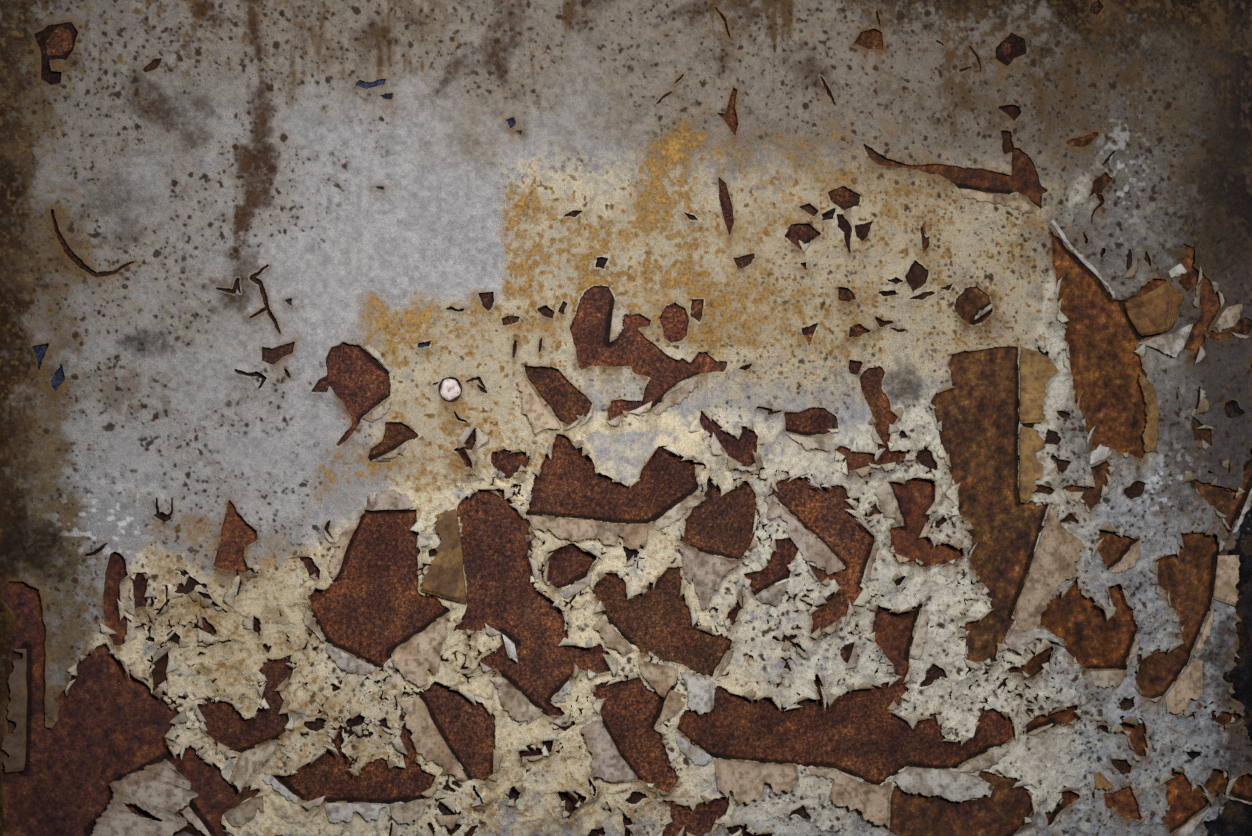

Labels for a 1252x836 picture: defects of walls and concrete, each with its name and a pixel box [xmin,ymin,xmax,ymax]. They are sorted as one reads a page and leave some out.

rust [485,12,516,77]
crack [51,209,134,277]
rust [363,123,868,383]
peeling [719,178,734,235]
peeling [785,186,872,269]
peeling [864,105,1047,214]
peeling [1066,132,1098,147]
peeling [1089,173,1112,196]
crack [216,264,281,334]
crack [234,369,290,389]
peeling [1,219,1252,836]